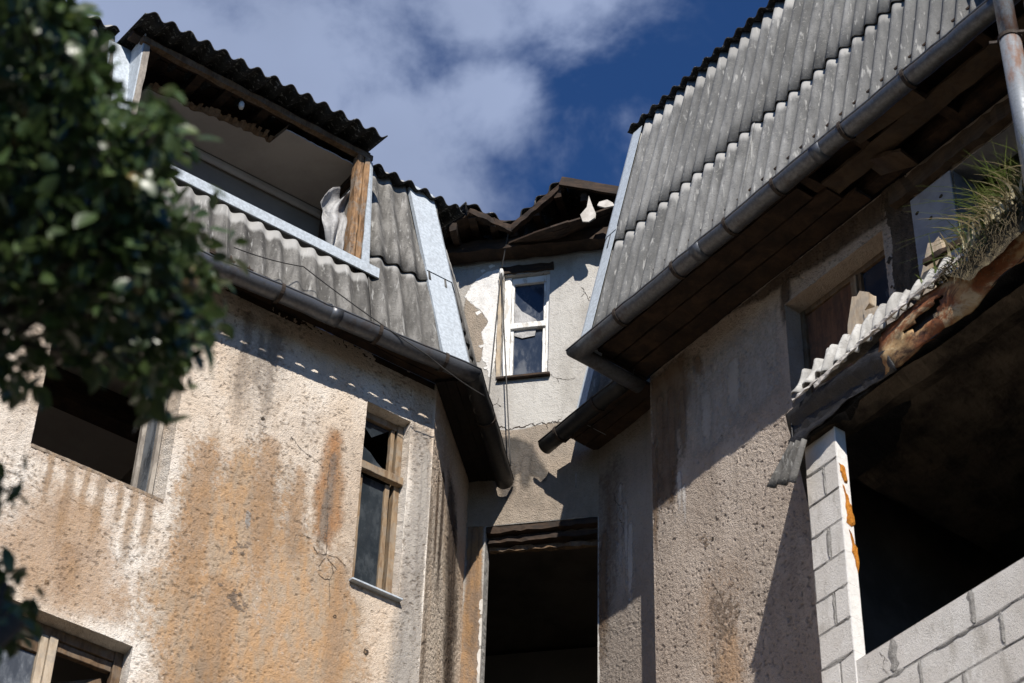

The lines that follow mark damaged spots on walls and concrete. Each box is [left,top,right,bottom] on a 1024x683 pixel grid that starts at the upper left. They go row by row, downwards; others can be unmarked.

peeling [464,264,500,377]
water stain [44,453,55,491]
water stain [57,462,106,532]
water stain [116,482,153,549]
rust [138,431,366,683]
crack [290,435,345,605]